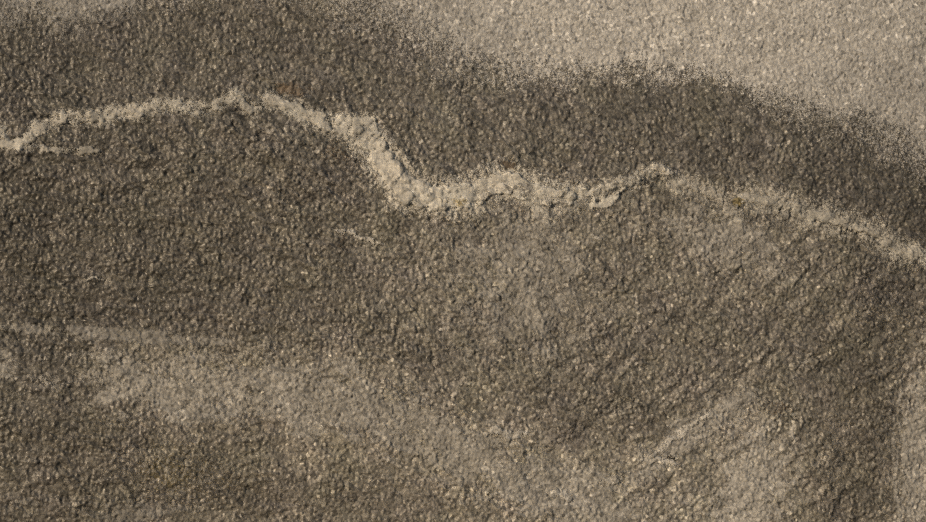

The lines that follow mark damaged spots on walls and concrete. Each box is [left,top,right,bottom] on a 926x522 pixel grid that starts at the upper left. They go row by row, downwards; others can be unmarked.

crack [606,188,642,222]
crack [823,223,888,275]